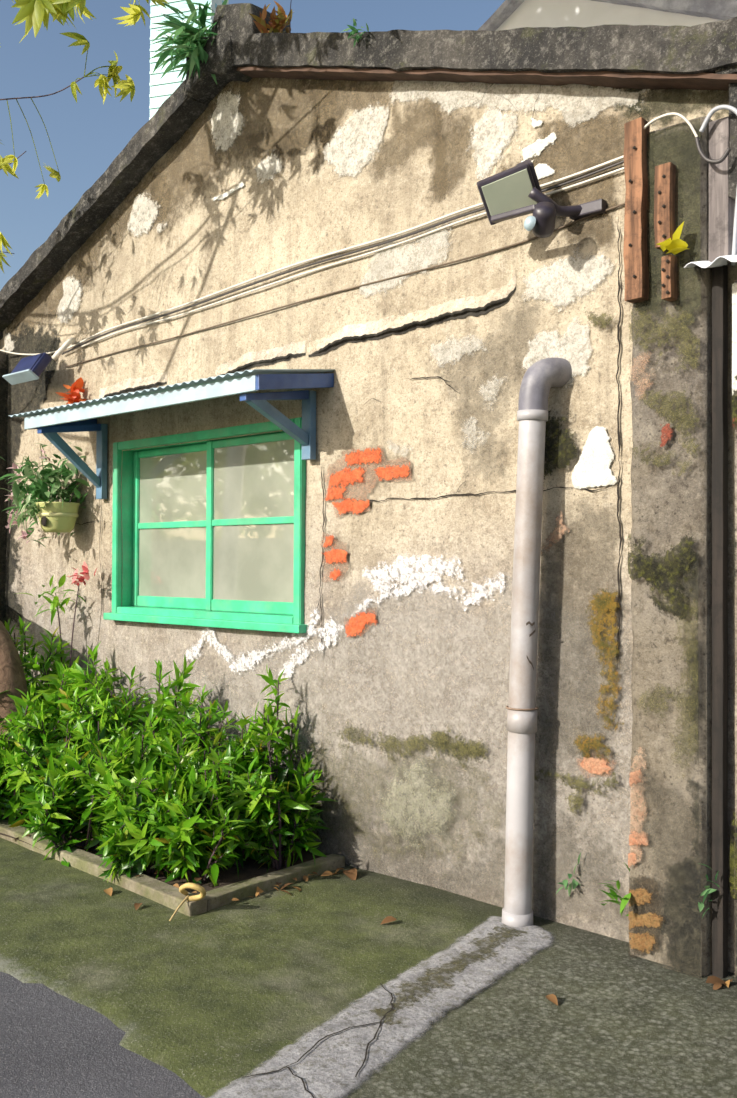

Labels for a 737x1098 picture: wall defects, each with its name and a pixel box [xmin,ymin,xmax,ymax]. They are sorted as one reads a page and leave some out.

peeling [211,88,245,151]
peeling [323,102,389,178]
peeling [127,193,167,237]
leakage [0,78,473,635]
spalling [221,286,516,375]
crack [410,376,460,394]
flaking render [324,445,412,517]
crack [369,481,516,502]
crack [543,216,622,668]
leakage [112,553,513,890]
leakage [532,599,702,978]
crack [242,983,394,1098]